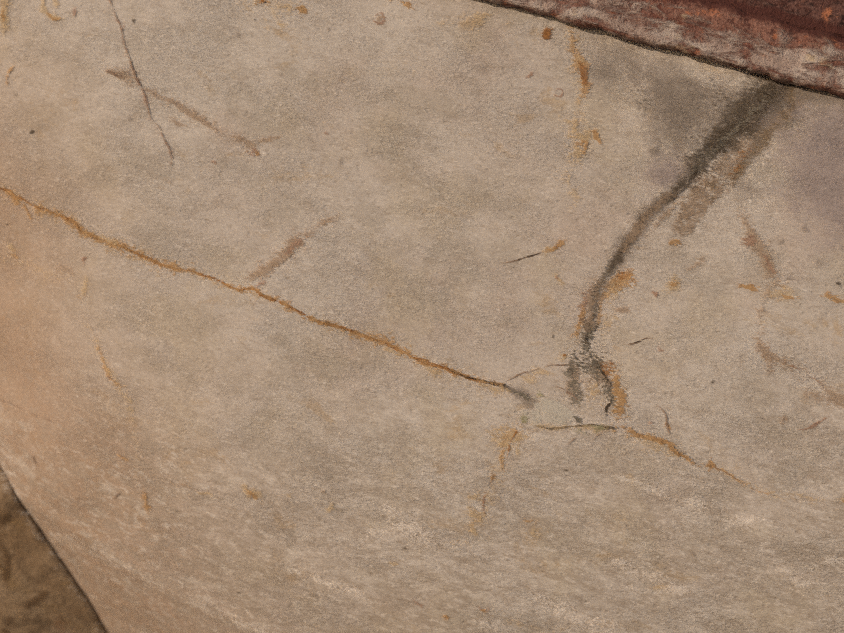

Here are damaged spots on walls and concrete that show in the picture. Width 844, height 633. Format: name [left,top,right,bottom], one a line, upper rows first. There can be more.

rust [568,34,593,97]
damp [648,72,844,235]
crack [0,98,774,493]
damp [740,217,777,277]